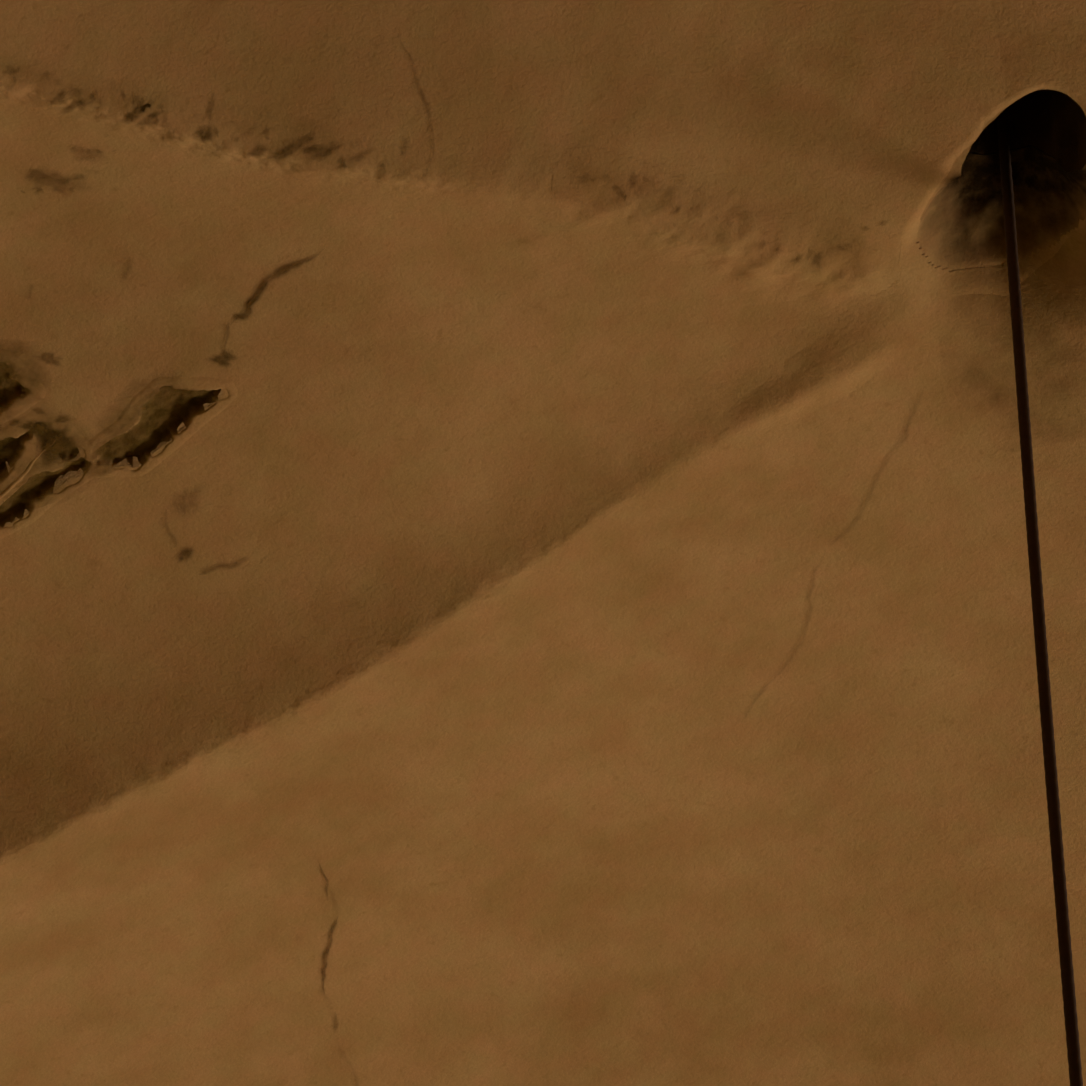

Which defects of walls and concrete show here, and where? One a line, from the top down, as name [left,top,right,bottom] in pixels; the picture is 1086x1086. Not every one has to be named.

flaking render [916,108,1086,270]
crack [235,259,311,320]
crack [214,354,233,365]
flaking render [0,350,238,539]
crack [322,922,336,981]